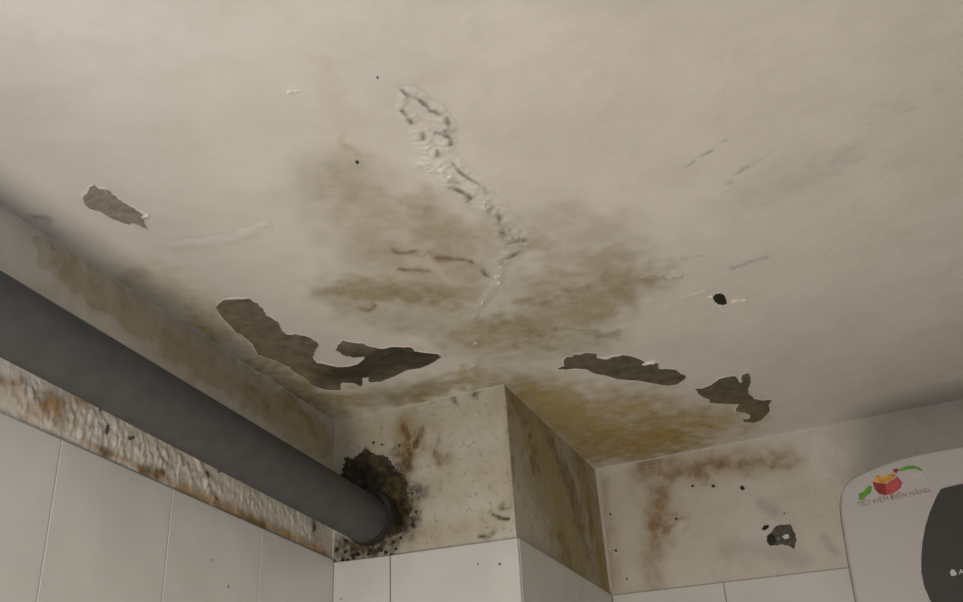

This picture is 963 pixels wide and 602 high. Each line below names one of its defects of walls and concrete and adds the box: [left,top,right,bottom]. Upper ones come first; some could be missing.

peeling [80,183,150,230]
peeling [213,297,443,391]
water stain [327,268,470,311]
water stain [450,272,649,349]
peeling [556,352,688,386]
peeling [694,372,773,423]
spalling [340,449,411,538]
water stain [334,441,422,562]
water stain [491,379,725,571]
spalling [762,524,797,549]